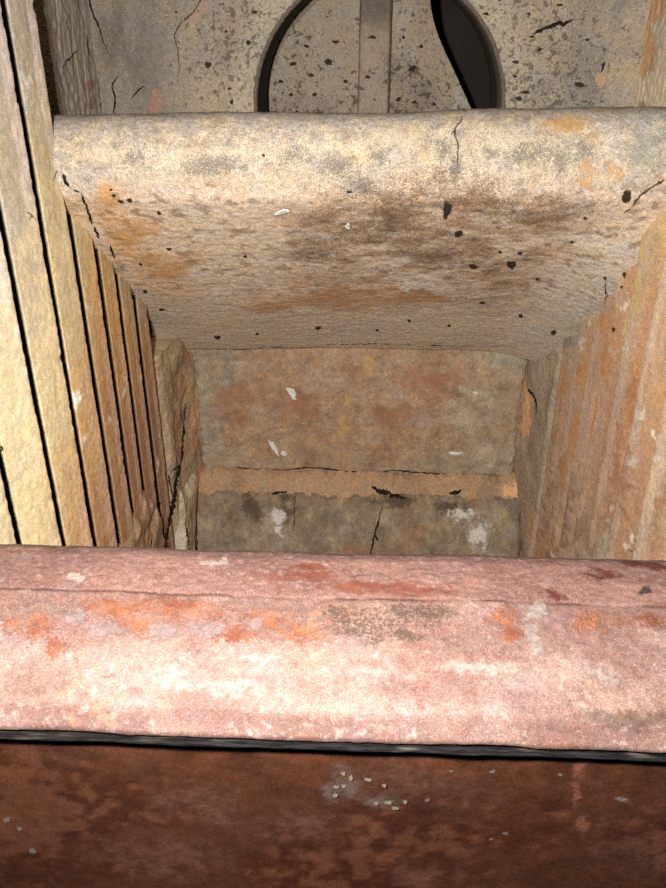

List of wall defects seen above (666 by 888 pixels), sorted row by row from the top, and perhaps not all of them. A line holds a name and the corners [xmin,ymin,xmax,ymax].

crack [61,0,144,114]
crack [174,0,201,84]
crack [451,117,462,168]
crack [237,465,356,473]
efflorescence [271,509,286,536]
crack [370,470,440,554]
efflorescence [448,508,491,550]
corrosion [623,561,666,569]
corrosion [1,611,65,661]
corrosion [69,596,326,647]
corrosion [486,600,523,643]
corrosion [574,608,666,636]